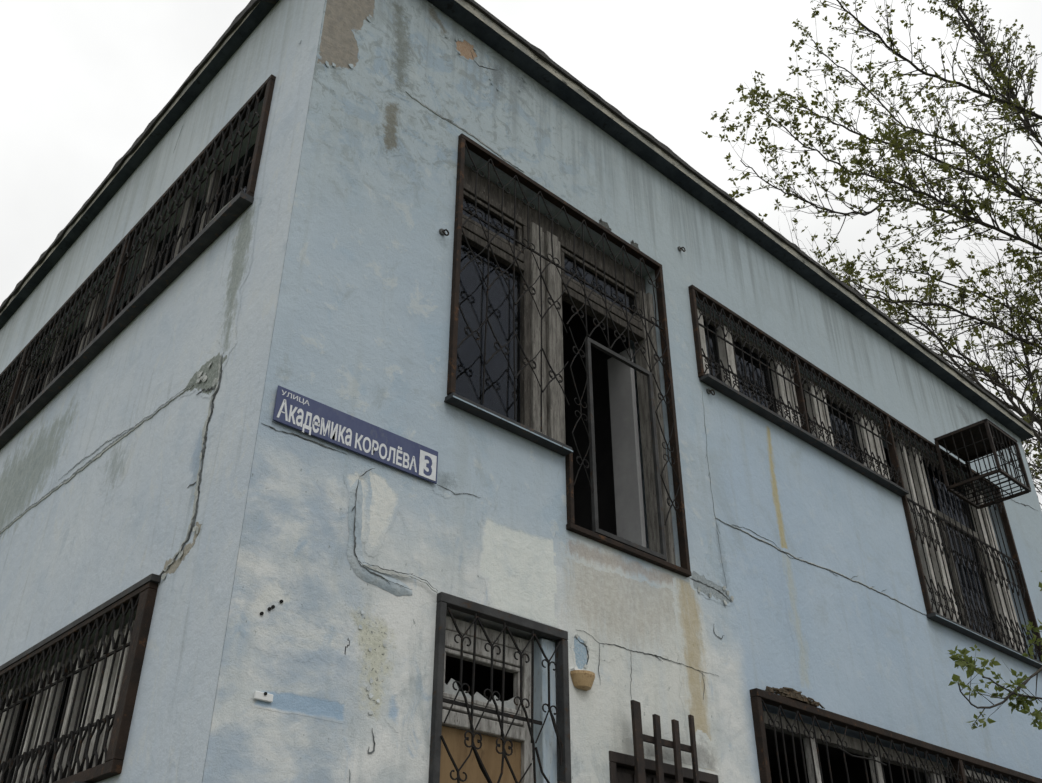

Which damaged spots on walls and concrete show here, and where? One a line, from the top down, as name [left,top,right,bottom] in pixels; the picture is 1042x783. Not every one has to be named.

peeling [316,0,380,77]
crack [0,354,223,576]
crack [262,423,343,453]
crack [352,468,438,594]
crack [689,393,926,615]
water stain [553,519,677,671]
crack [578,630,718,699]